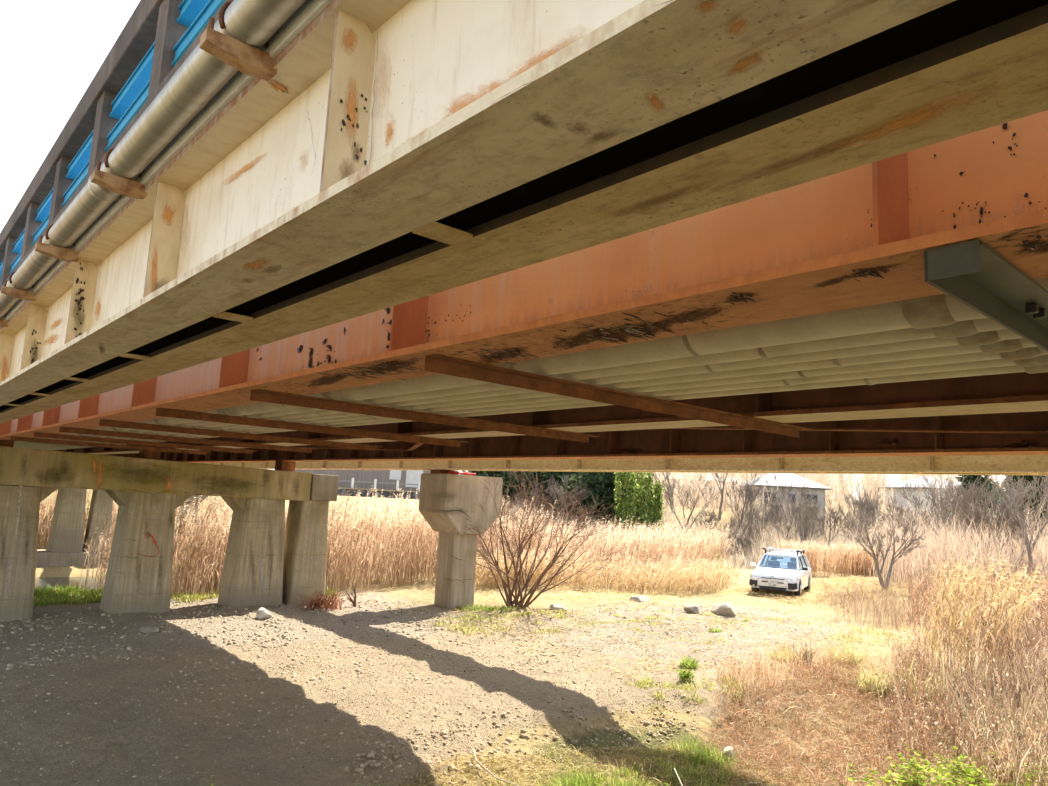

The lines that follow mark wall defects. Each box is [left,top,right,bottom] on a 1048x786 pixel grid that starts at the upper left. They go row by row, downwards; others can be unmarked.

corrosion [347,85,356,130]
corrosion [1019,235,1048,254]
corrosion [814,265,895,288]
corrosion [553,292,759,349]
corrosion [475,347,540,365]